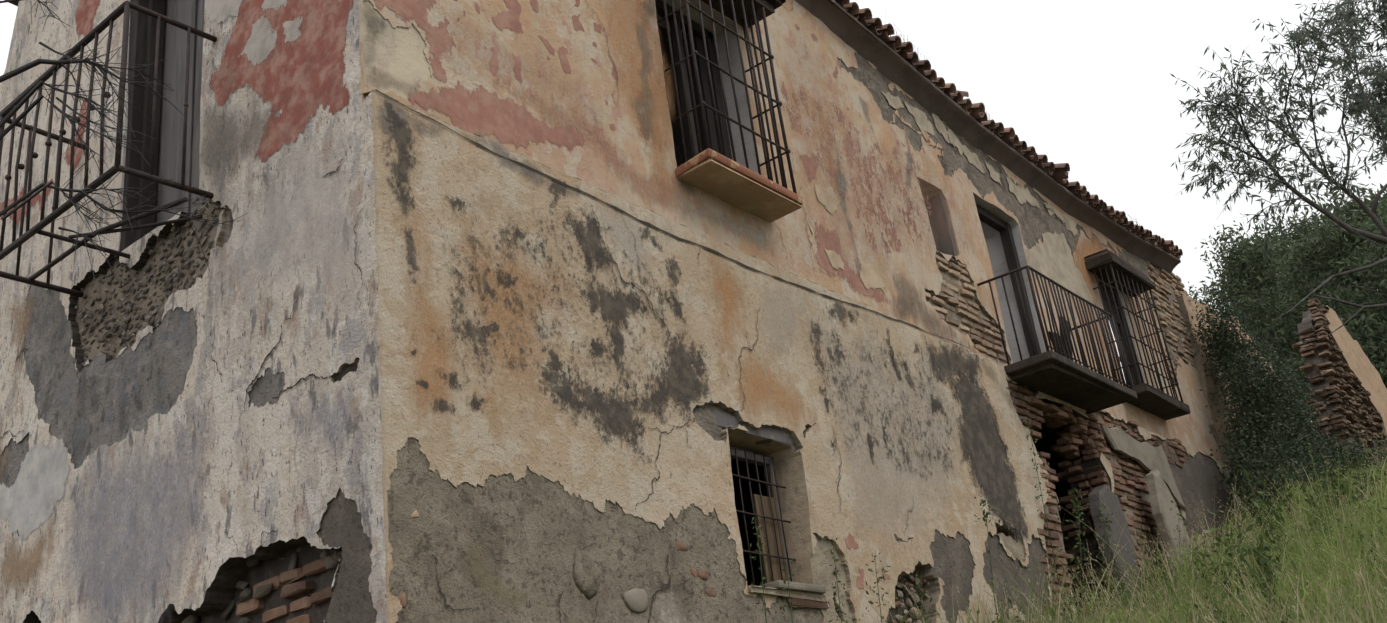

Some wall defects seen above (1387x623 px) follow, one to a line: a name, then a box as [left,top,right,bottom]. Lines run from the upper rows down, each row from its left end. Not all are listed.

peeling [205,0,618,162]
flaking render [0,196,232,488]
crack [211,294,327,409]
damp [408,139,713,463]
flaking render [316,437,864,623]
crack [635,419,695,509]
crack [376,89,969,389]
crack [739,310,760,405]
damp [810,277,1028,541]
flaking render [781,51,1196,392]
flaking render [925,250,1250,623]